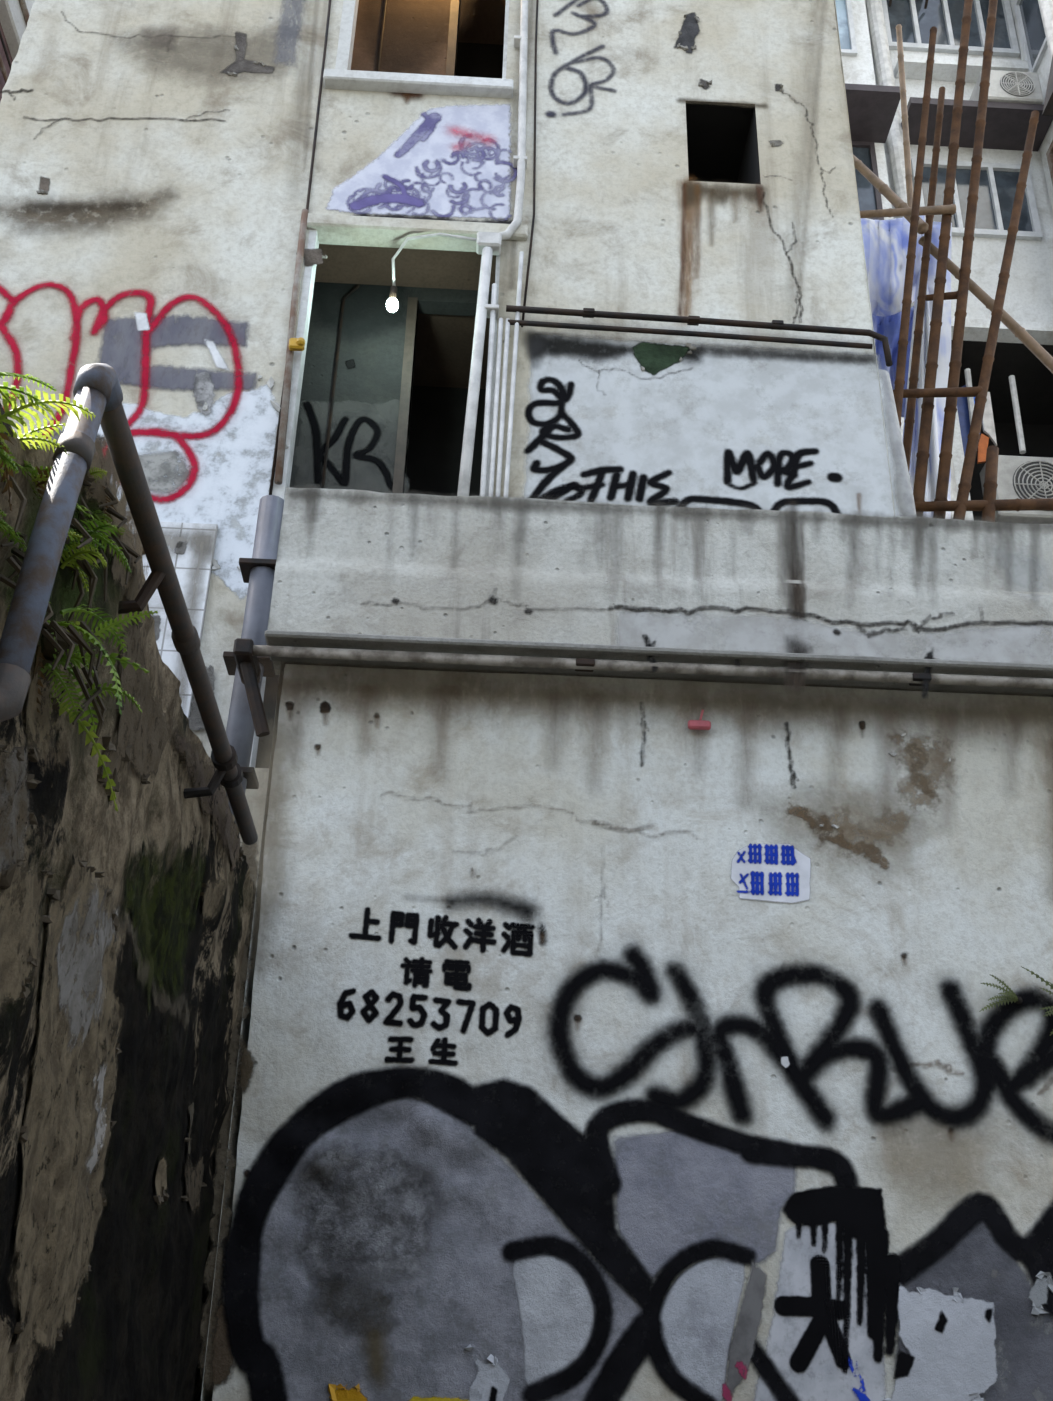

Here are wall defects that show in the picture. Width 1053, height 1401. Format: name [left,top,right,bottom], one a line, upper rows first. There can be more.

crack [0,88,225,139]
leakage [7,198,158,229]
corrosion [679,181,698,316]
crack [762,193,803,323]
peeling [31,428,65,443]
peeling [122,371,409,598]
leakage [466,498,568,509]
leakage [846,515,1001,528]
leakage [788,502,808,621]
crack [609,605,1053,672]